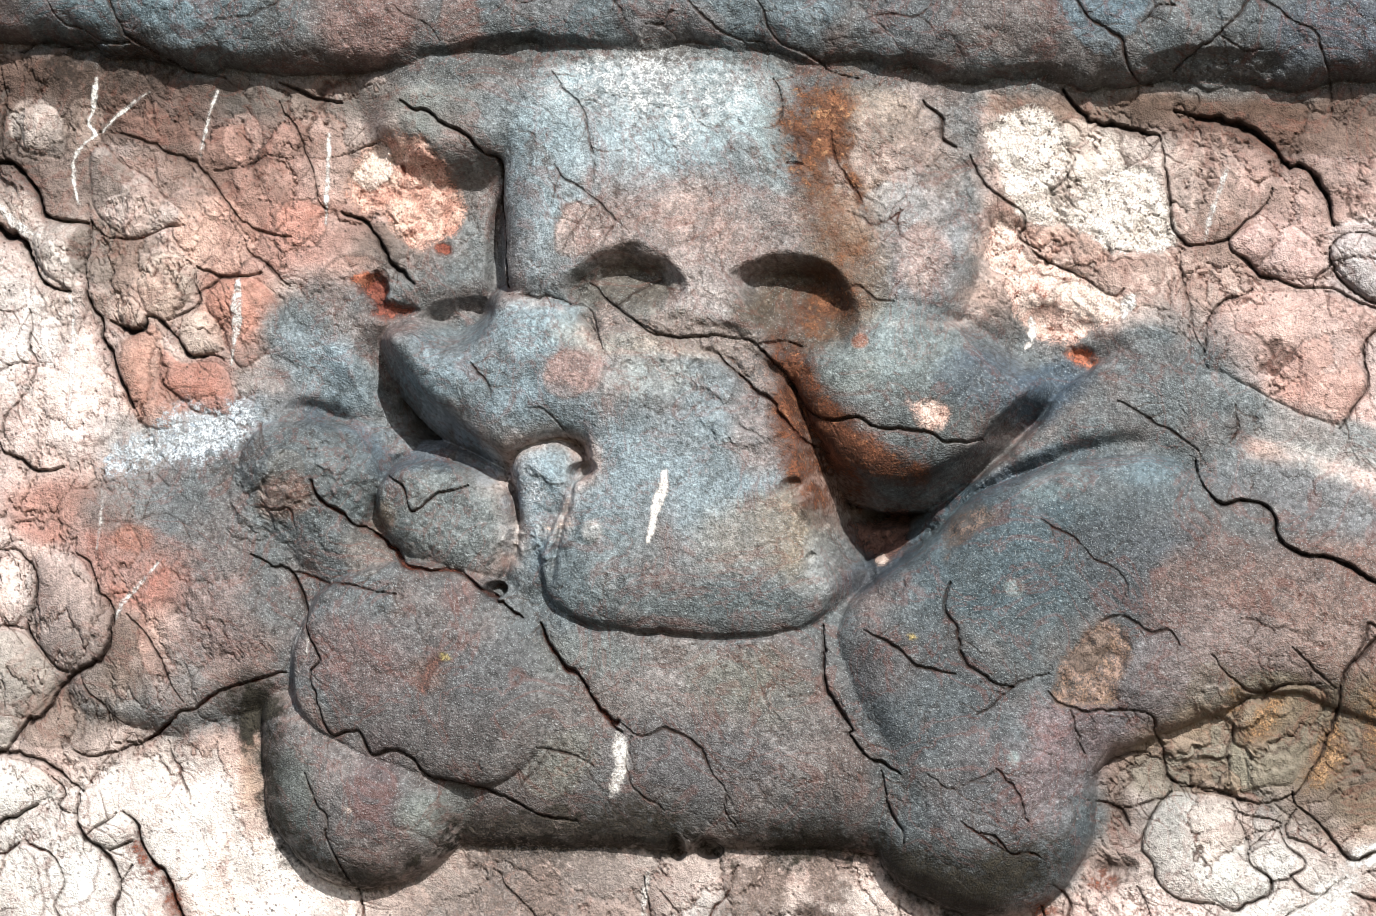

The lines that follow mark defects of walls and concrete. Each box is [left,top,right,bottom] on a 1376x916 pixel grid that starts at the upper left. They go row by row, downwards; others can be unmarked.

crack [0,113,59,285]
crack [1194,116,1331,215]
crack [88,235,276,408]
crack [1167,196,1295,343]
crack [292,483,515,613]
crack [1215,499,1376,583]
crack [0,567,120,912]
crack [543,629,644,798]
spalling [1052,622,1132,707]
crack [134,819,185,916]
crack [1235,868,1321,916]
crack [1327,832,1373,861]